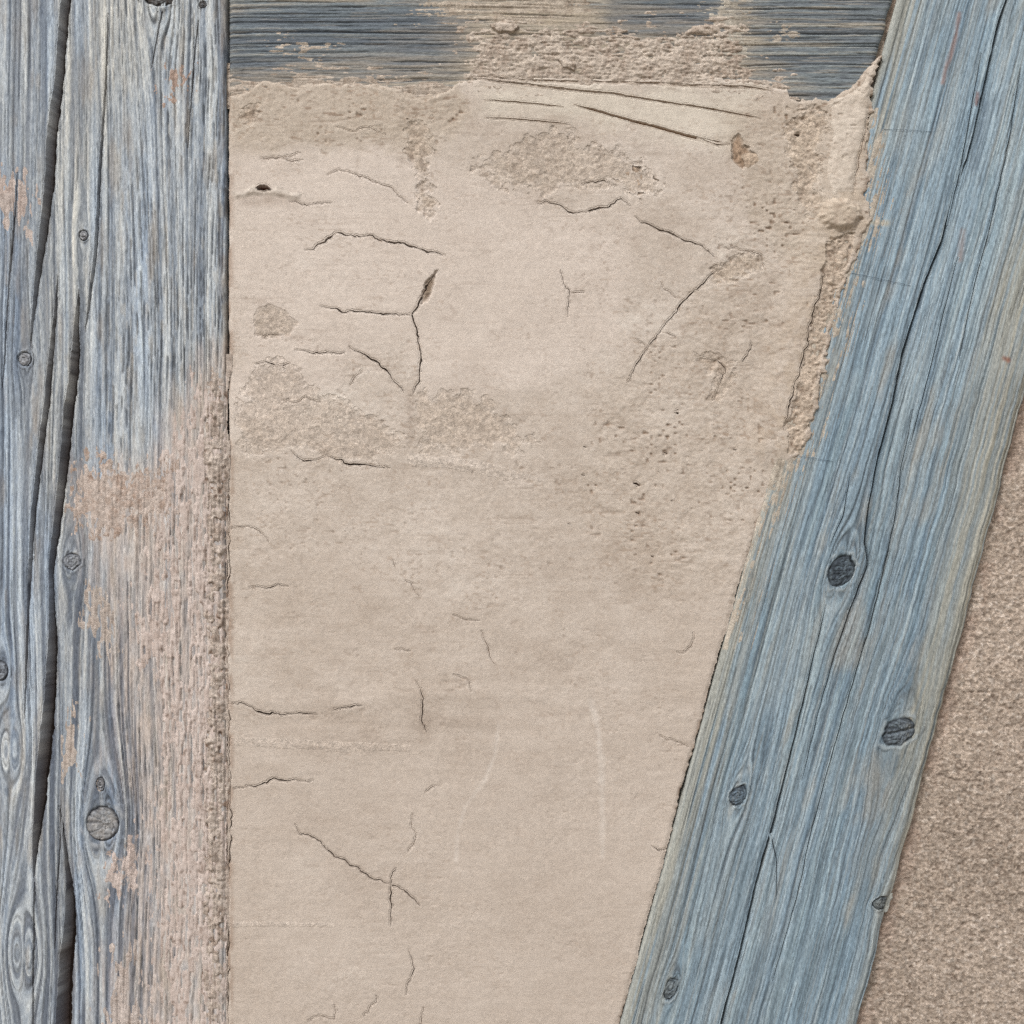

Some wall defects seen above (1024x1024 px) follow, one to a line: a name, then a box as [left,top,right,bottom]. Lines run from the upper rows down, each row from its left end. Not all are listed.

crack [289,199,332,207]
crack [327,168,408,204]
spalling [730,133,759,170]
spalling [775,104,833,224]
crack [254,231,446,394]
crack [537,179,765,383]
spalling [693,351,739,417]
spalling [784,232,855,455]
crack [225,479,363,879]
crack [294,784,437,927]
crack [225,905,233,1024]